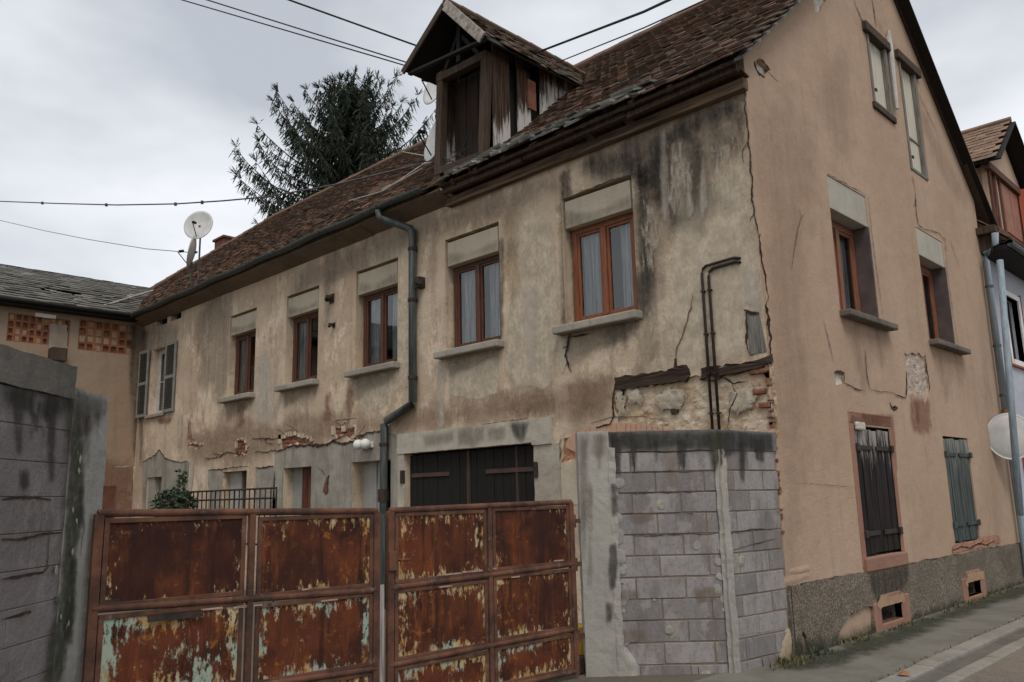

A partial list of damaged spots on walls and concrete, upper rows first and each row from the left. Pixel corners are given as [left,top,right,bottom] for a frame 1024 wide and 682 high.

water stain [586,97,761,368]
crack [742,95,772,356]
crack [563,333,589,372]
crack [674,296,693,363]
crack [845,349,908,398]
spalling [905,353,930,401]
water stain [9,389,94,480]
spalling [277,424,314,449]
spalling [331,418,365,438]
spalling [614,355,782,495]
water stain [609,432,773,513]